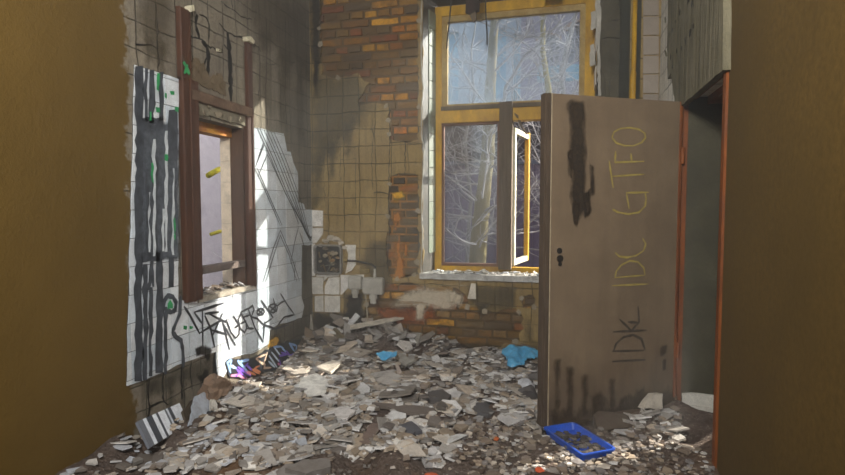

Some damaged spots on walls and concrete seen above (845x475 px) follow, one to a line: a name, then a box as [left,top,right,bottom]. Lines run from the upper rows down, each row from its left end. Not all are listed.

flaking render [317,0,421,142]
flaking render [363,173,536,348]